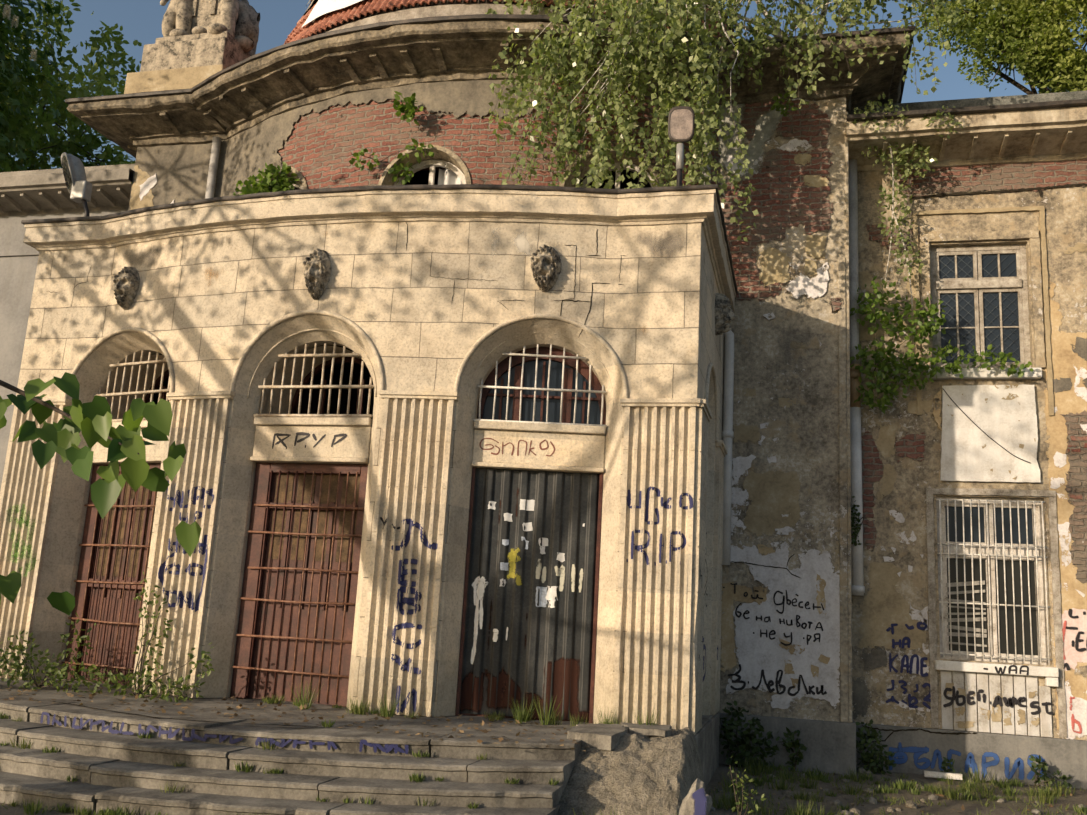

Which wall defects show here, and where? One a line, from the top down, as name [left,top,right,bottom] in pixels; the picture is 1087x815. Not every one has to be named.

peeling [209,80,534,198]
spalling [718,98,844,313]
spalling [897,159,1087,200]
crack [406,222,524,308]
crack [554,231,625,336]
peeling [720,416,930,720]
peeling [1019,278,1087,740]